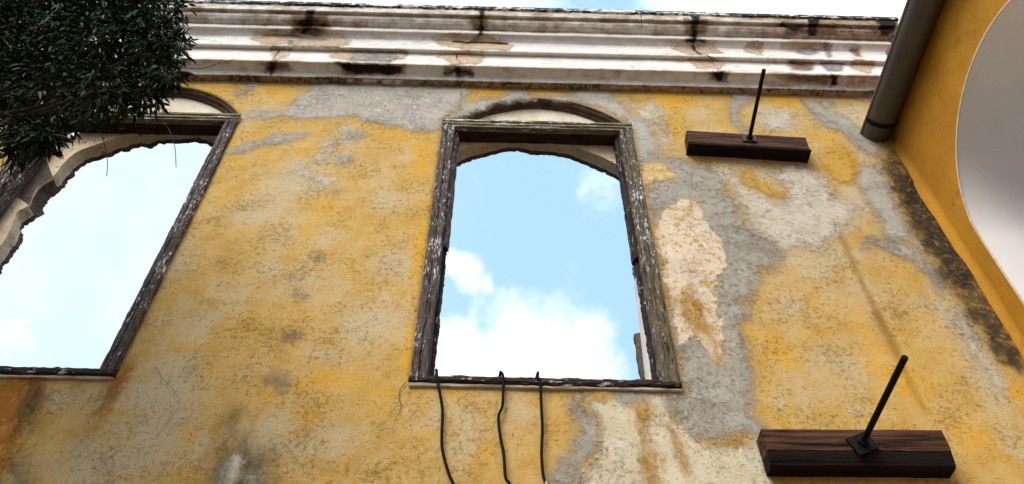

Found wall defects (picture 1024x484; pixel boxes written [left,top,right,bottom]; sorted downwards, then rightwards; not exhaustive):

leakage [338,62,403,75]
leakage [471,10,488,40]
leakage [683,15,708,54]
leakage [779,19,844,86]
peeling [631,103,678,149]
peeling [759,112,793,130]
peeling [714,162,859,252]
flaking render [654,199,729,364]
leakage [882,151,1023,369]
flaking render [582,392,774,484]